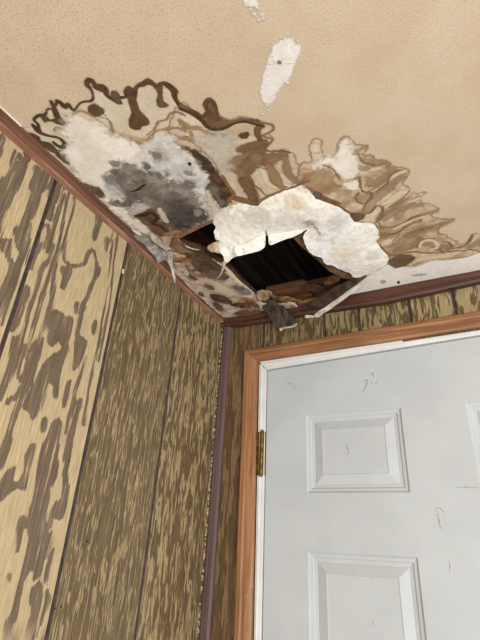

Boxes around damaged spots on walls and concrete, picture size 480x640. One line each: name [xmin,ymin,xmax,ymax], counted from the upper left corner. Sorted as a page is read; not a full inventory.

peeling [243,0,266,22]
peeling [259,36,302,115]
water stain [24,77,480,268]
peeling [57,114,480,318]